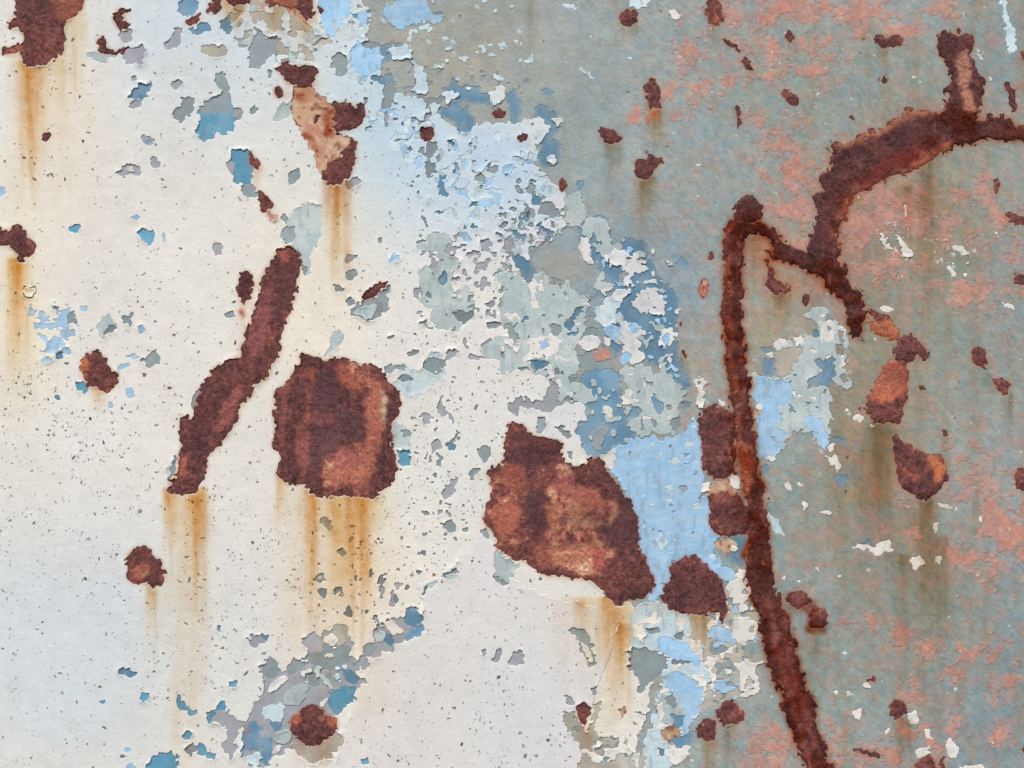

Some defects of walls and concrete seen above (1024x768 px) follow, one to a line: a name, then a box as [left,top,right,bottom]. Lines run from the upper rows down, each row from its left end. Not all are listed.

corrosion [2,0,85,67]
peeling [22,286,88,363]
peeling [75,381,88,394]
peeling [97,312,145,339]
corrosion [124,546,167,589]
corrosion [166,246,302,496]
corrosion [272,353,402,500]
peeling [116,0,768,768]
corrosion [482,421,728,624]
corrosion [697,404,749,537]
peeling [766,506,785,537]
peeling [747,293,852,485]